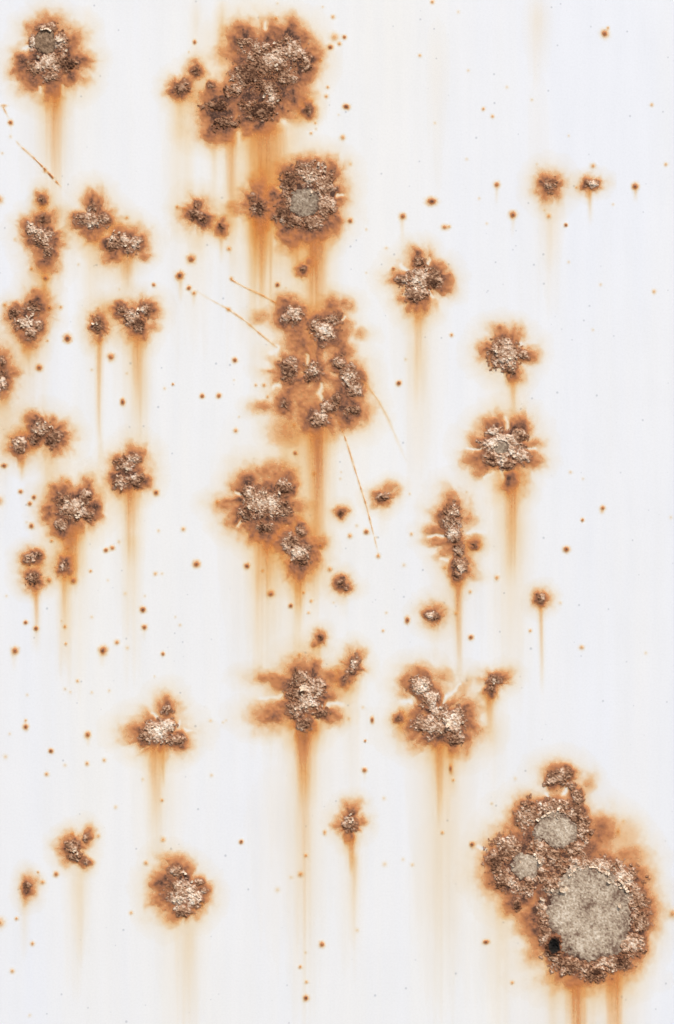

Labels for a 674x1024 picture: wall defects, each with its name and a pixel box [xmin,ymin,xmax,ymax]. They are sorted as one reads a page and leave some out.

rust [11,15,92,100]
rust [167,17,332,143]
rust [5,192,63,347]
rust [183,156,352,277]
rust [391,248,454,312]
rust [259,283,368,485]
rust [463,415,541,493]
rust [19,477,103,591]
rust [219,465,325,593]
rust [258,630,364,757]
rust [393,666,479,752]
rust [470,763,657,1009]